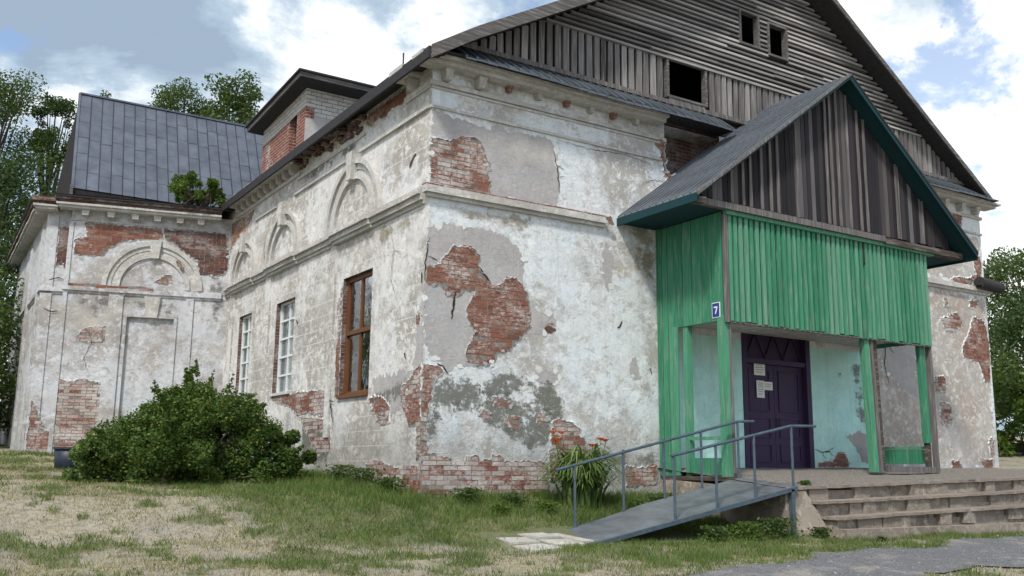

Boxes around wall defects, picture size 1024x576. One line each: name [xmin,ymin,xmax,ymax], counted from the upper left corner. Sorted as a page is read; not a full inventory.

spalling [366,87,408,128]
peeling [427,109,560,206]
spalling [55,208,256,291]
spalling [18,378,101,454]
spalling [76,325,106,344]
spalling [269,287,343,457]
peeling [365,221,588,497]
leakage [426,371,562,450]
peeling [817,430,868,468]
flaking render [877,212,995,468]